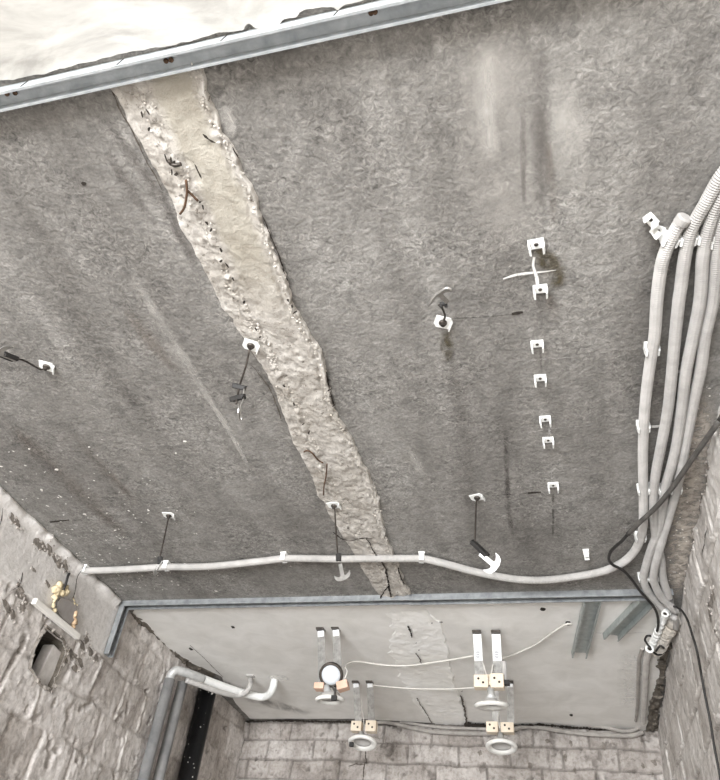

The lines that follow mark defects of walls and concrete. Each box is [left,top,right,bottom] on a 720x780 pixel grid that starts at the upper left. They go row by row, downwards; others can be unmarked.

water stain [537,249,563,285]
peeling [199,99,409,595]
spalling [32,538,70,573]
crack [333,532,405,598]
spalling [2,579,30,624]
spalling [28,624,100,694]